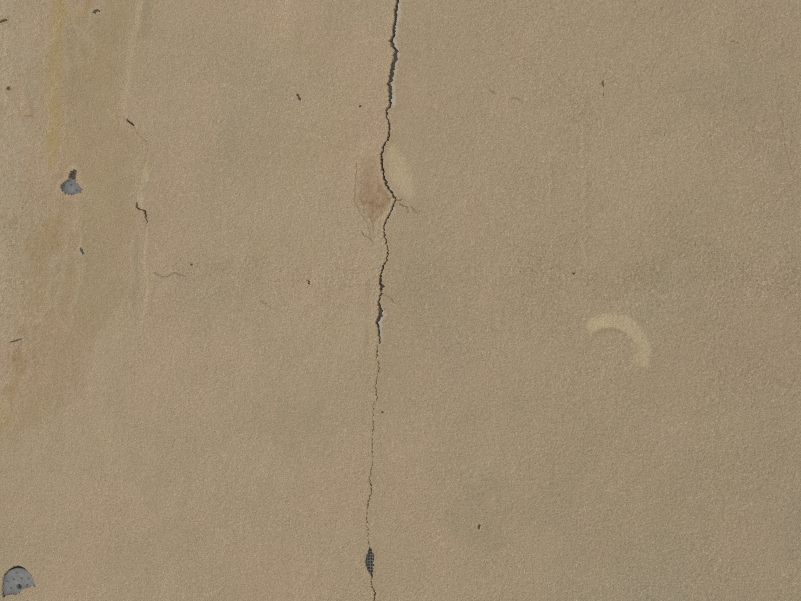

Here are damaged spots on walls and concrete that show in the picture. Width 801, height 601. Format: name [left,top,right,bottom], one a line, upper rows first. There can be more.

spalling [55,164,88,200]
crack [350,0,426,601]
spalling [0,560,40,601]